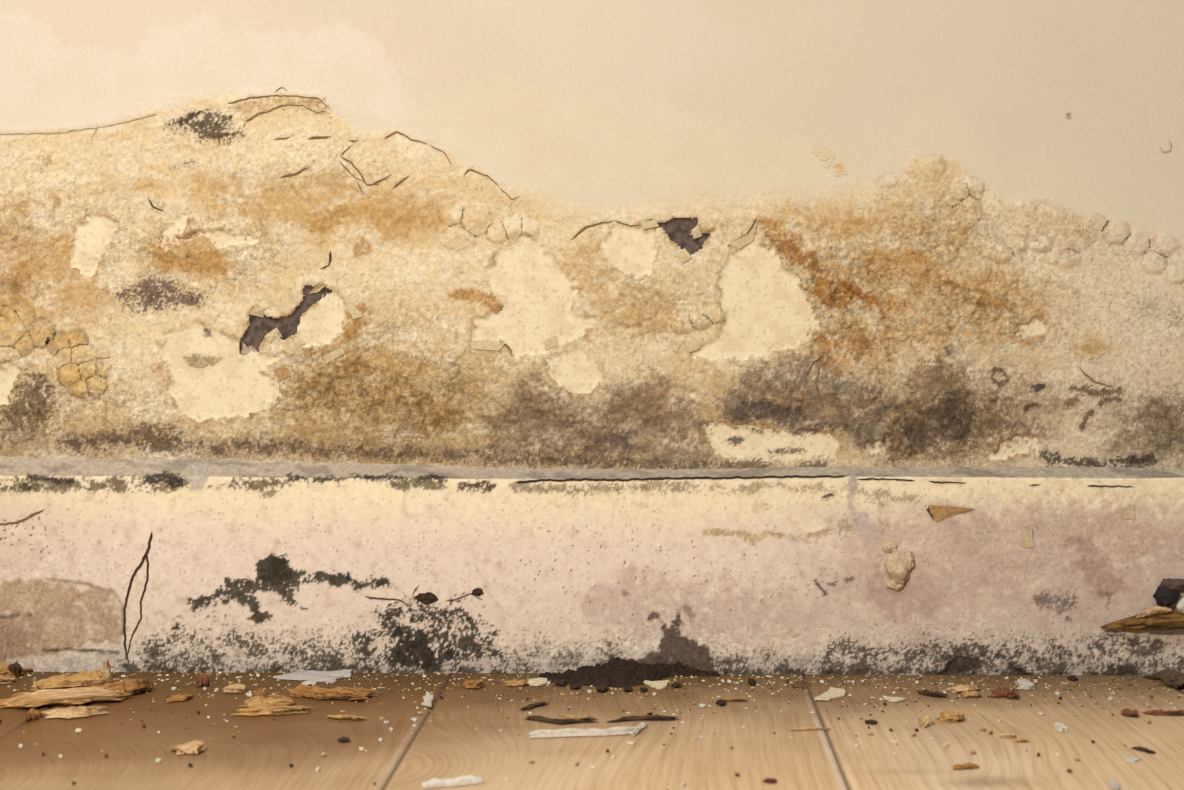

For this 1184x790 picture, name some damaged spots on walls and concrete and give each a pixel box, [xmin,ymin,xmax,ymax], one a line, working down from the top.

crack [227,87,519,200]
damp [0,5,906,259]
damp [0,186,216,345]
spalling [162,285,363,422]
spalling [469,236,603,393]
spalling [601,218,710,279]
spalling [688,223,820,362]
crack [0,509,44,525]
damp [0,223,1184,676]
crack [123,532,152,663]